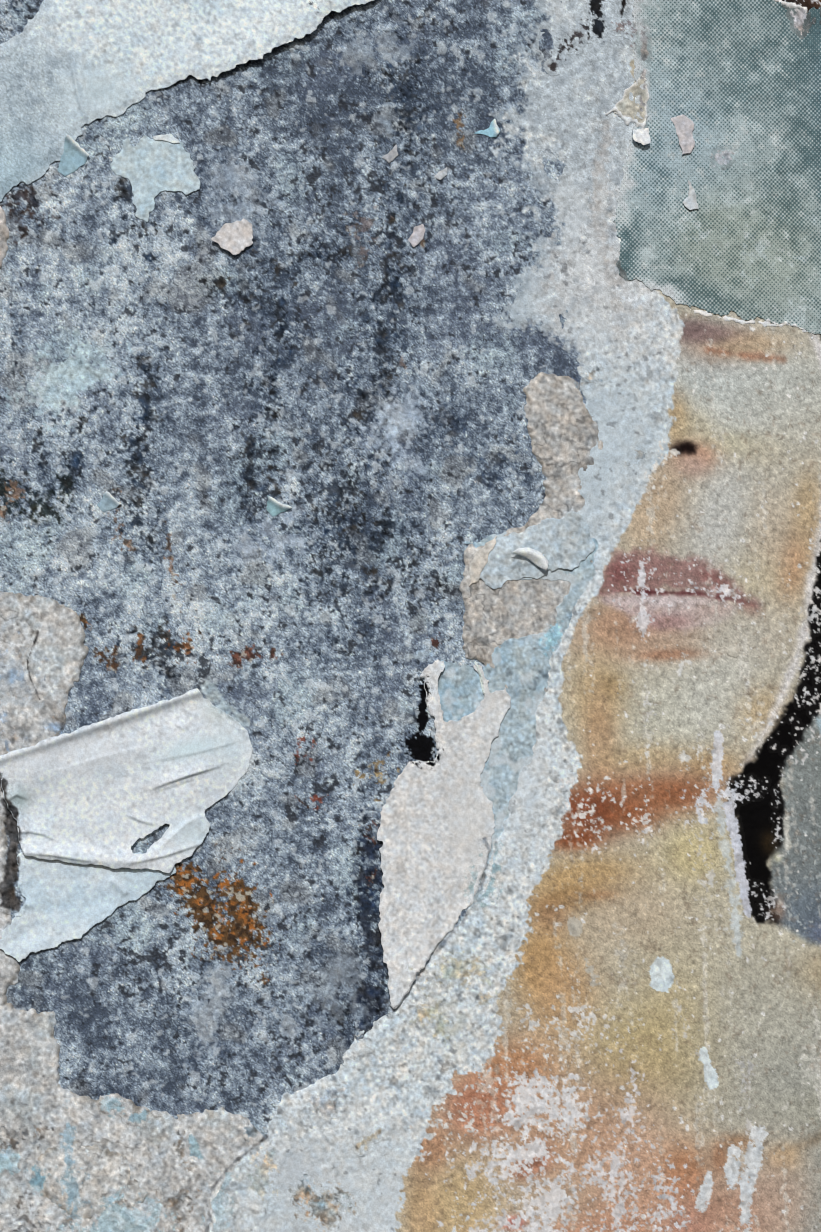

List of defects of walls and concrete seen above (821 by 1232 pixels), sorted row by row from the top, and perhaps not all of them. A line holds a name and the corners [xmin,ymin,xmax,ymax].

peeling [781,0,821,24]
peeling [382,144,398,163]
peeling [211,218,253,255]
peeling [408,224,425,247]
peeling [469,536,497,586]
peeling [545,517,821,961]
corrosion [155,842,283,989]